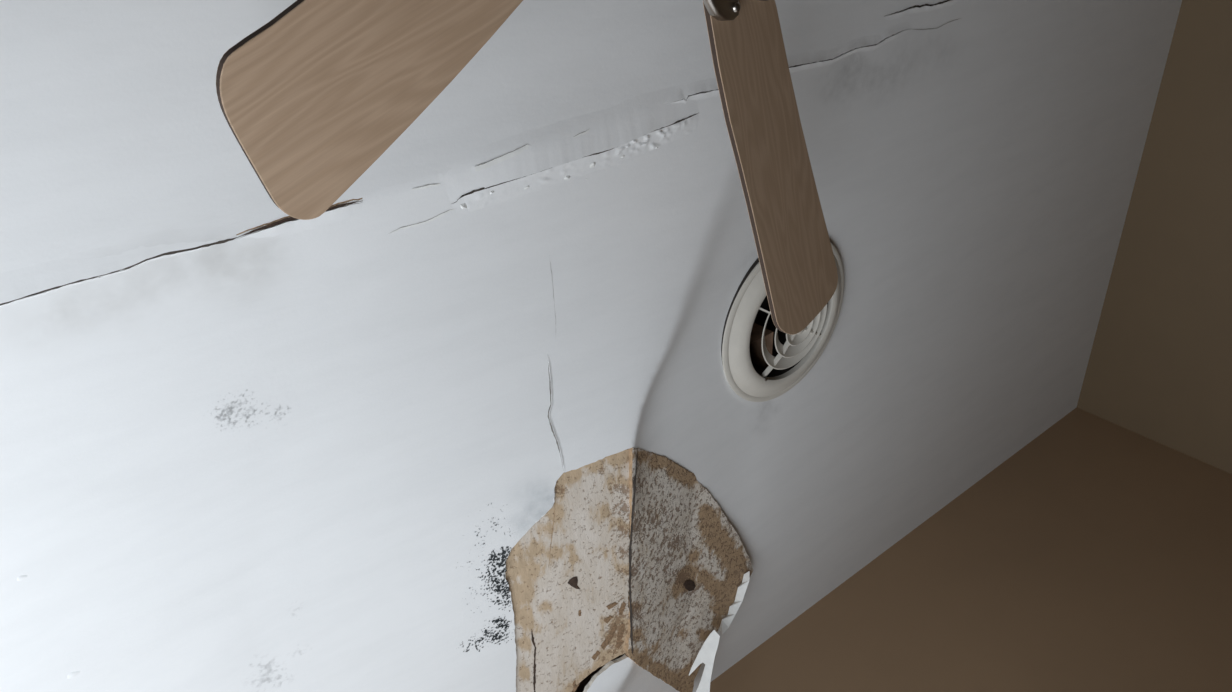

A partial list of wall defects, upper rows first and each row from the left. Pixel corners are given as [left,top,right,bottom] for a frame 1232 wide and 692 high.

crack [787,0,963,73]
crack [389,77,720,234]
crack [0,198,363,308]
spalling [750,323,773,372]
crack [548,355,566,473]
damp [462,503,512,652]
spalling [505,447,753,692]